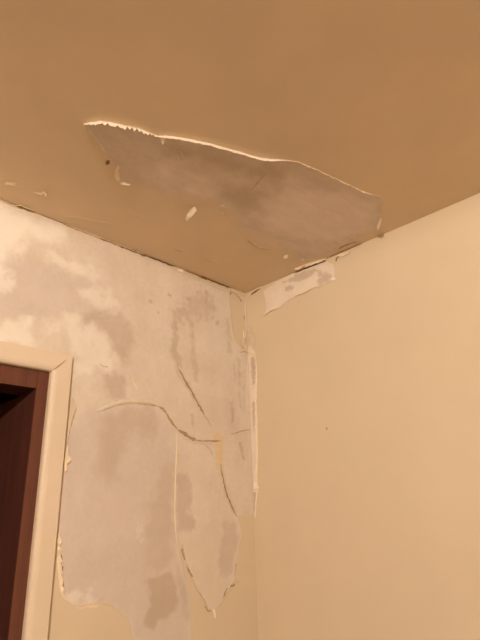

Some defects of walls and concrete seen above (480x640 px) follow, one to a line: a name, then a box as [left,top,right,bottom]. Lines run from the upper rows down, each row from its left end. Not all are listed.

peeling [84,120,384,317]
leakage [0,253,197,640]
crack [95,366,249,517]
leakage [148,283,256,431]